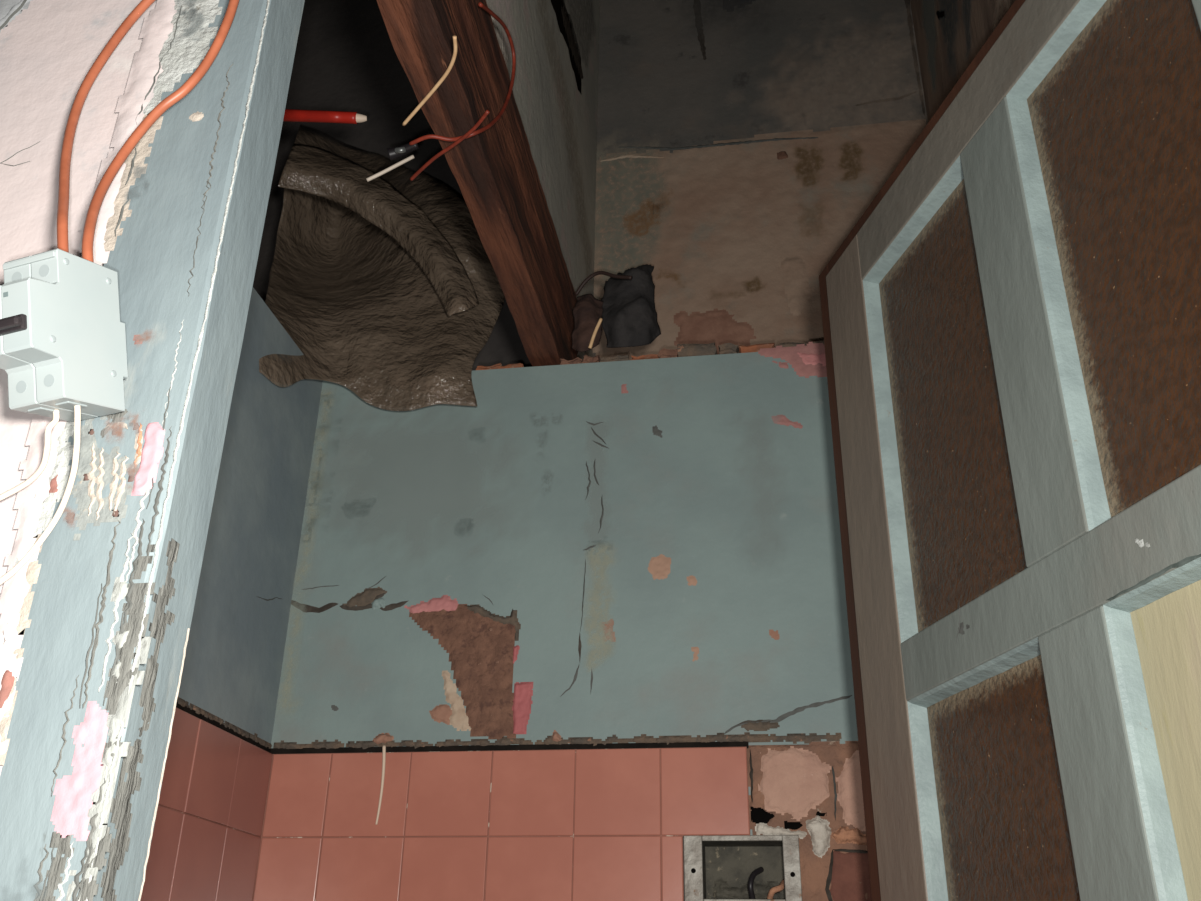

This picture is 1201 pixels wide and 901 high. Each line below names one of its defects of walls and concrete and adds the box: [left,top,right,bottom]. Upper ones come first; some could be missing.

peeling [491,16,509,65]
flaking render [560,119,926,378]
peeling [0,0,270,901]
crack [256,576,408,613]
crack [560,560,593,697]
peeling [648,554,671,580]
peeling [138,595,872,901]
crack [724,695,852,734]